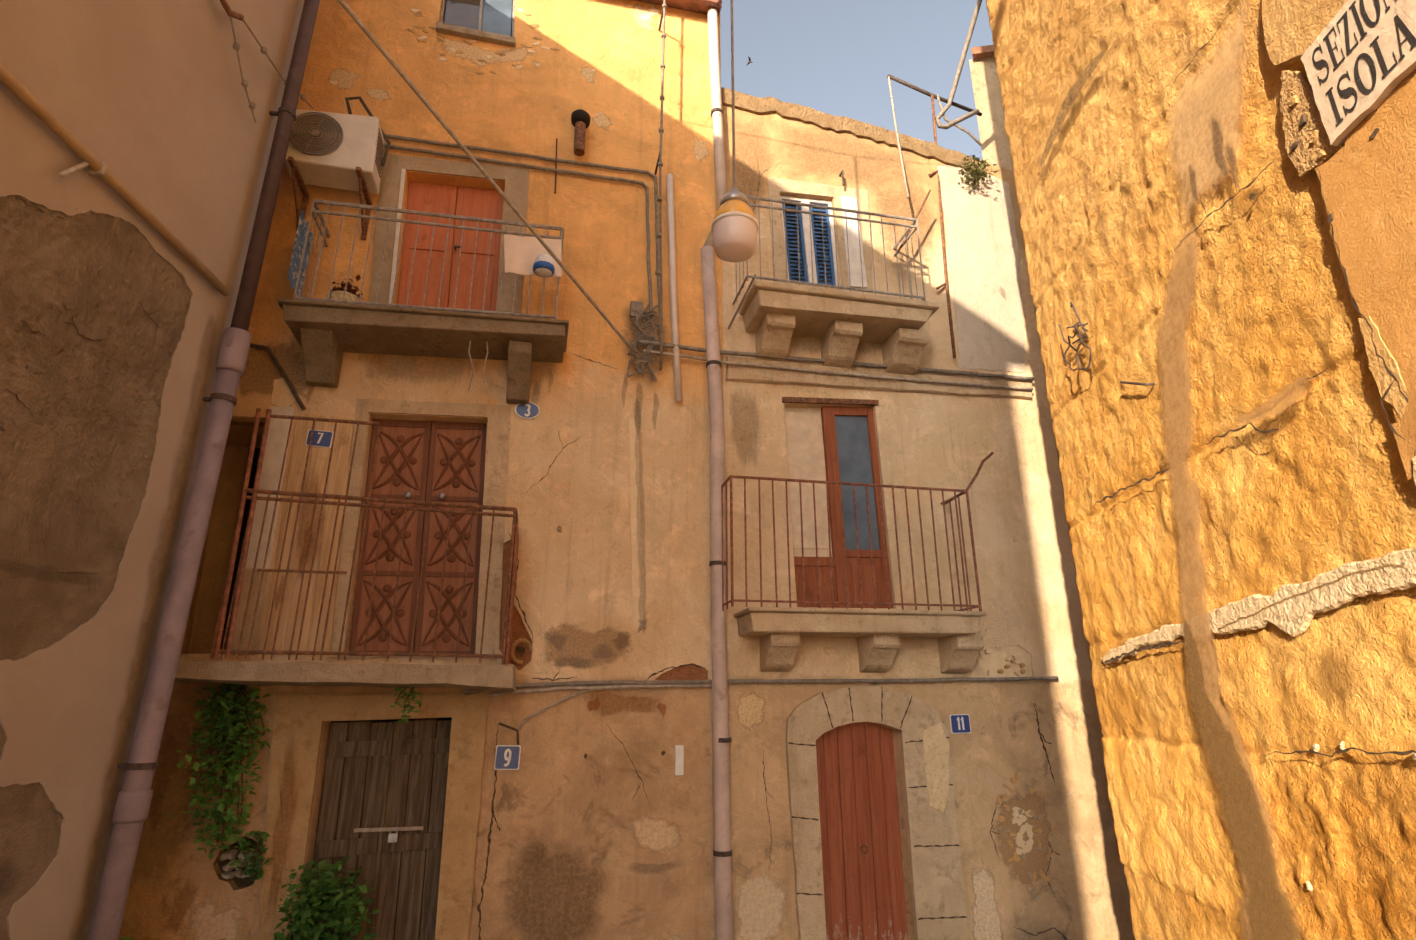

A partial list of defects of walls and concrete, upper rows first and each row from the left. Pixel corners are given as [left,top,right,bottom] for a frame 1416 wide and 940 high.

peeling [407,8,560,75]
crack [1317,168,1416,456]
peeling [0,195,192,661]
crack [1203,423,1279,445]
crack [1093,467,1172,507]
peeling [1208,547,1416,637]
leakage [546,625,628,667]
peeling [1101,623,1185,664]
crack [1265,747,1416,757]
peeling [0,782,63,940]
crack [477,723,500,940]
leakage [512,844,602,940]